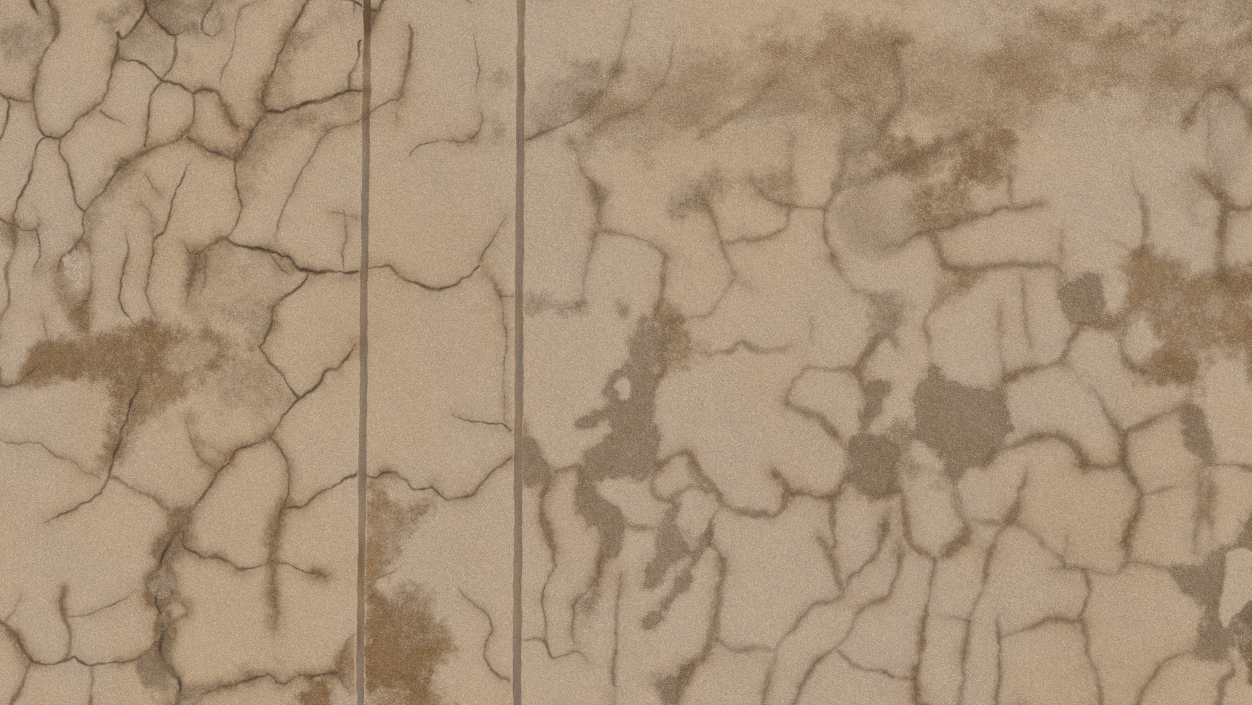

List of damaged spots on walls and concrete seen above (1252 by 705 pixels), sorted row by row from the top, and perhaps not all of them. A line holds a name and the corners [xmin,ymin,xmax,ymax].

damp [885,48,1050,225]
damp [23,252,226,464]
crack [0,0,512,705]
damp [364,590,456,705]
crack [533,464,582,658]
peeling [576,316,665,557]
crack [653,452,1023,705]
peeling [847,381,897,494]
peeling [913,367,1013,478]
crack [985,420,1152,555]
damp [1094,247,1252,385]
damp [1238,601,1252,684]